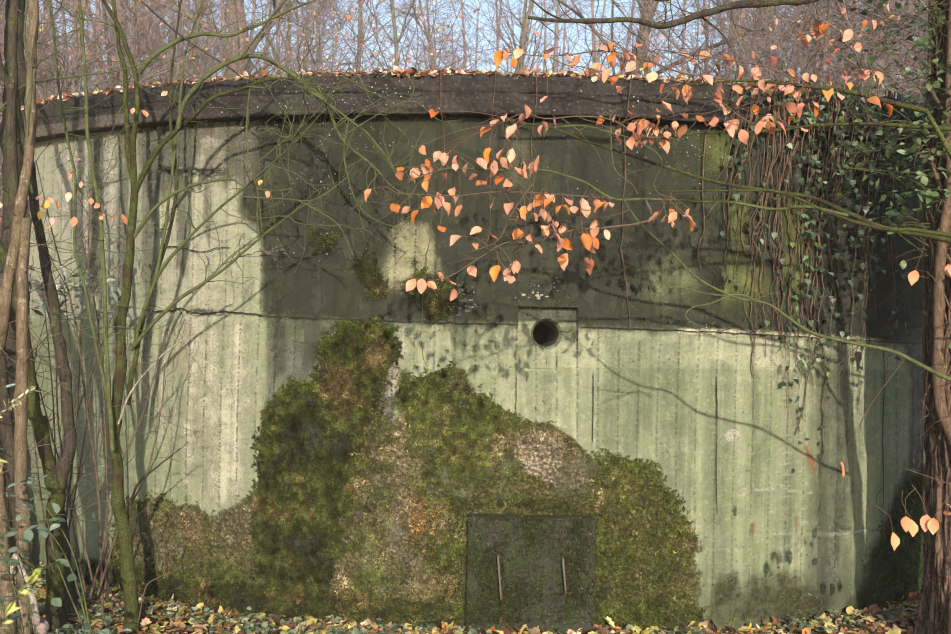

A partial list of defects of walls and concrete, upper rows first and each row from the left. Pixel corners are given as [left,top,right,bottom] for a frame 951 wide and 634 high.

leakage [56,135,129,370]
crack [153,304,534,334]
leakage [139,117,925,609]